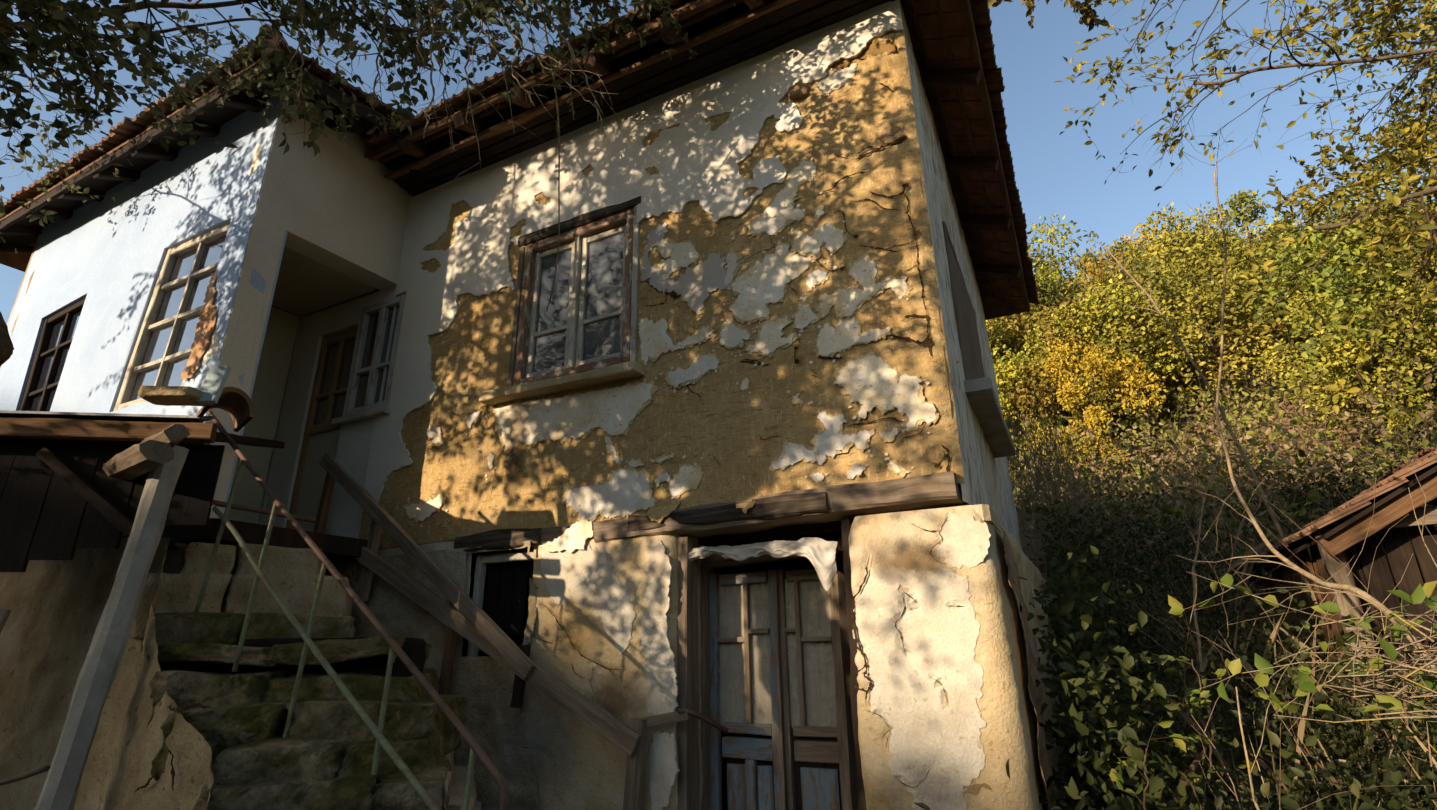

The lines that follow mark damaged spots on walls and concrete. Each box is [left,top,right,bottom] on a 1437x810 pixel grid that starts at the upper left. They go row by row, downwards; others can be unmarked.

flaking render [358,0,965,715]
crack [739,287,844,378]
crack [815,136,932,356]
peeling [649,731,680,810]
peeling [852,512,1057,810]